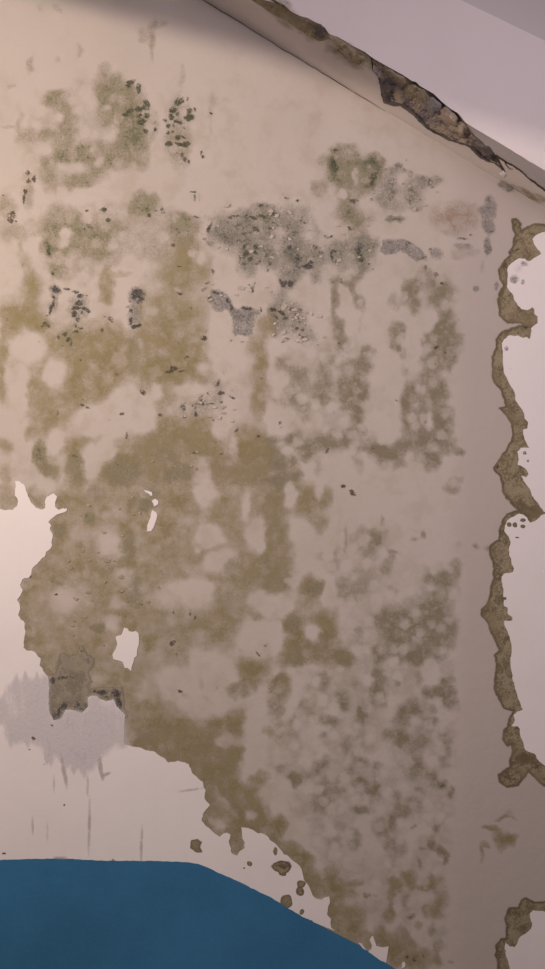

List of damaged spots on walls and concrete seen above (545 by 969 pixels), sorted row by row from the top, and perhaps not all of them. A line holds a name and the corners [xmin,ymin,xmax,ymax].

crack [203,0,383,110]
water stain [22,73,196,203]
flaking render [479,196,495,255]
crack [495,154,545,191]
water stain [0,145,464,968]
peeling [481,218,545,787]
peeling [0,481,335,931]
peeling [358,936,389,963]
peeling [495,898,545,969]